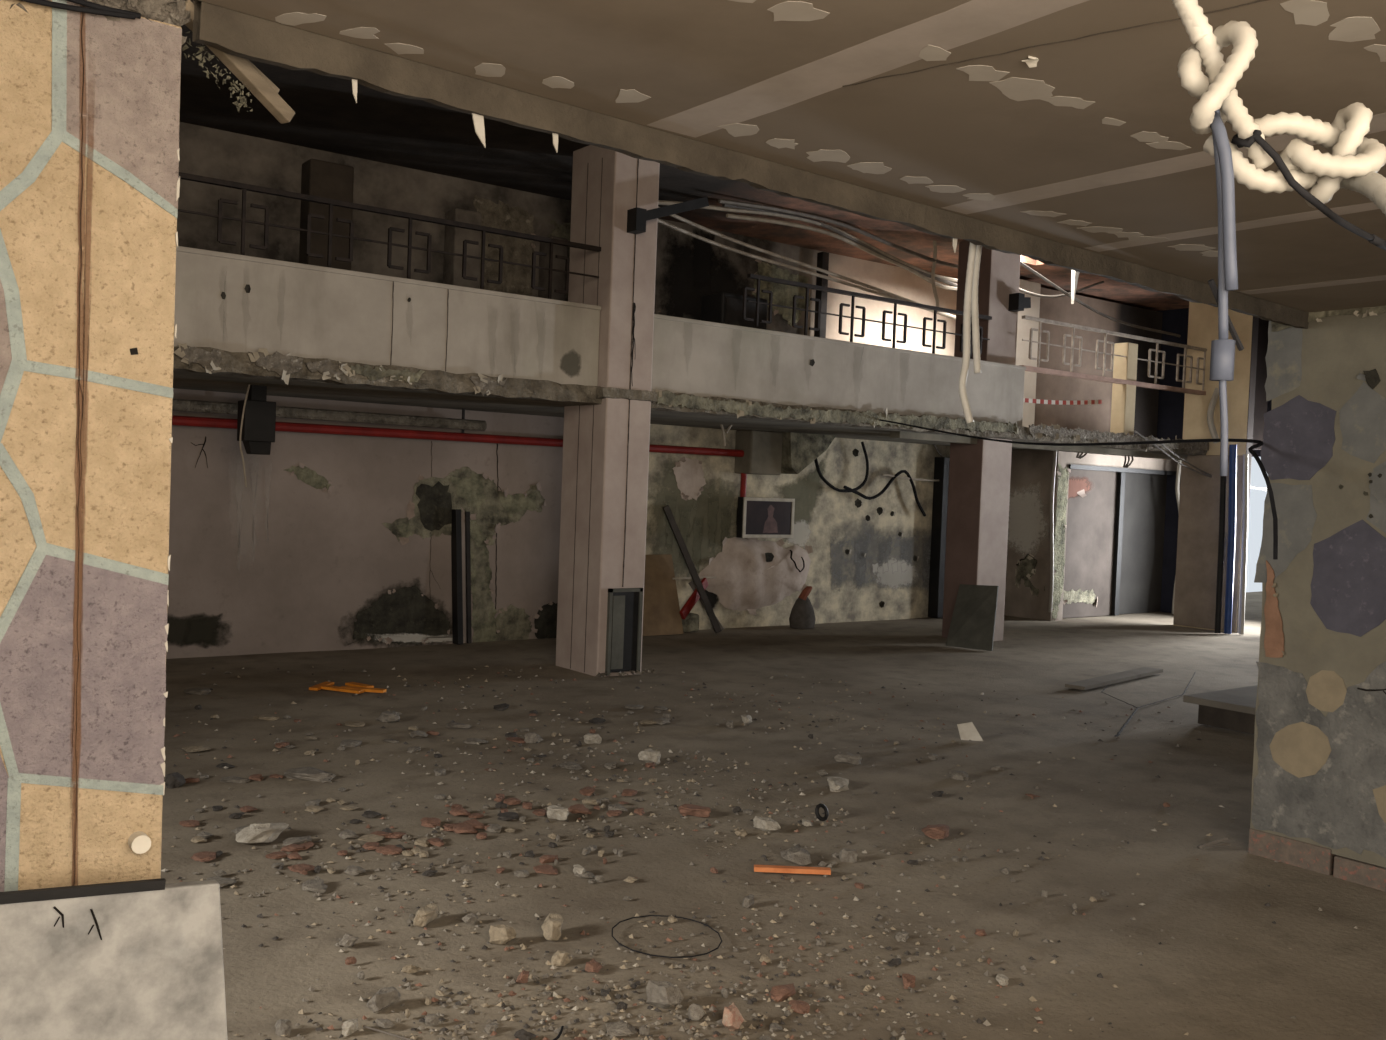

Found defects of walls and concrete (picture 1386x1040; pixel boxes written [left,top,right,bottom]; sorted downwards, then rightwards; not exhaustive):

spalling [174,324,222,374]
spalling [248,348,425,385]
spalling [469,373,508,396]
spalling [1356,369,1380,389]
leakage [647,463,737,574]
leakage [780,460,825,546]
peeling [382,467,558,642]
leakage [831,523,931,589]
peeling [342,580,453,647]
flaking render [1264,560,1285,658]